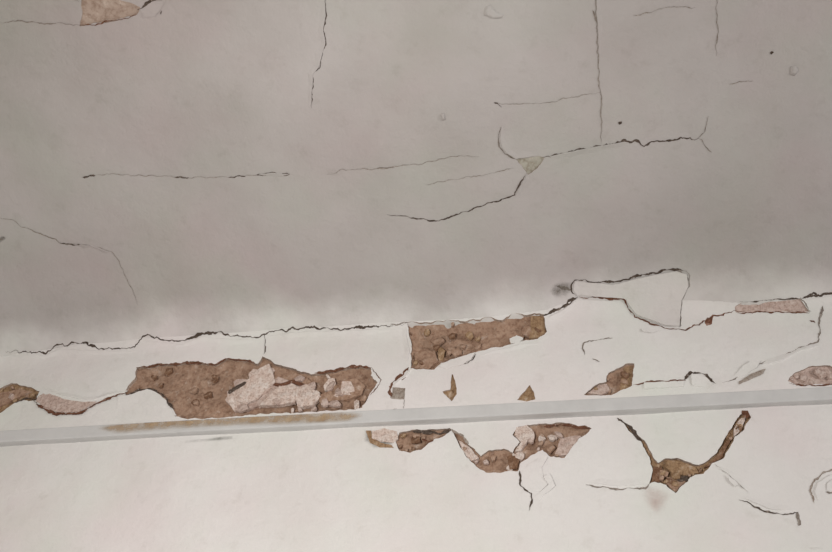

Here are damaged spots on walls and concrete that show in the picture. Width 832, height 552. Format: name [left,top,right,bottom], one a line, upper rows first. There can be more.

crack [83,171,292,179]
crack [543,268,741,333]
spalling [0,356,378,419]
crack [5,323,405,359]
crack [371,367,411,408]
spalling [391,313,547,401]
spalling [584,363,714,396]
crack [726,292,832,384]
spalling [788,365,832,386]
spalling [366,422,592,510]
spalling [586,410,751,493]
crack [715,465,832,526]